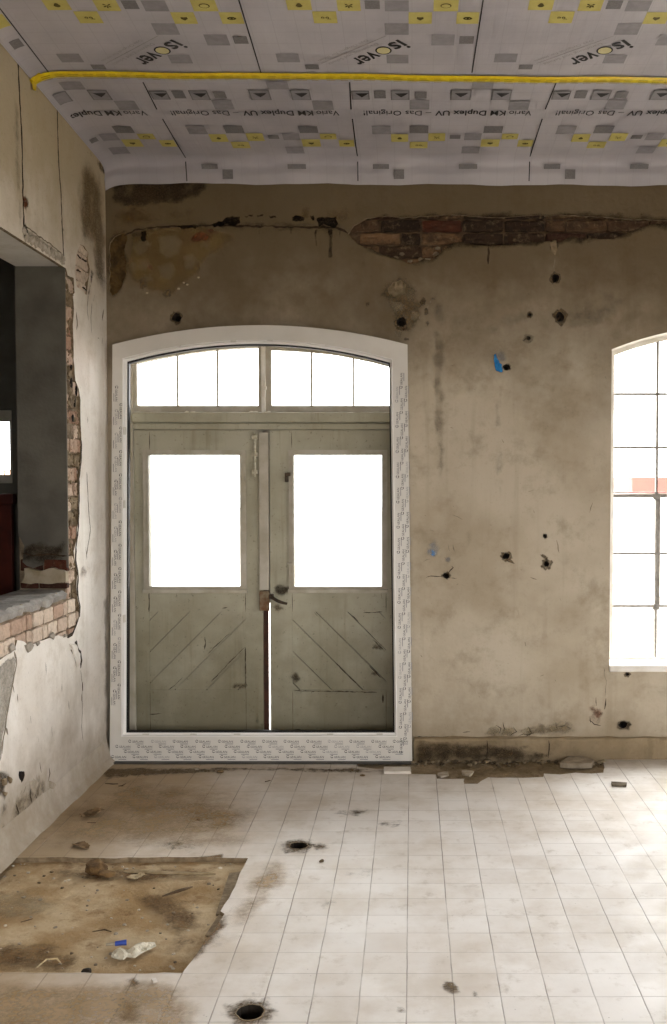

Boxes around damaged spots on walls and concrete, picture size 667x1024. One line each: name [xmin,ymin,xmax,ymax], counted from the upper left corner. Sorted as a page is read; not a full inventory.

water stain [82,163,104,277]
flaking render [108,231,128,295]
flaking render [349,213,667,284]
flaking render [0,225,89,759]
water stain [418,744,542,760]
peeling [0,766,56,815]